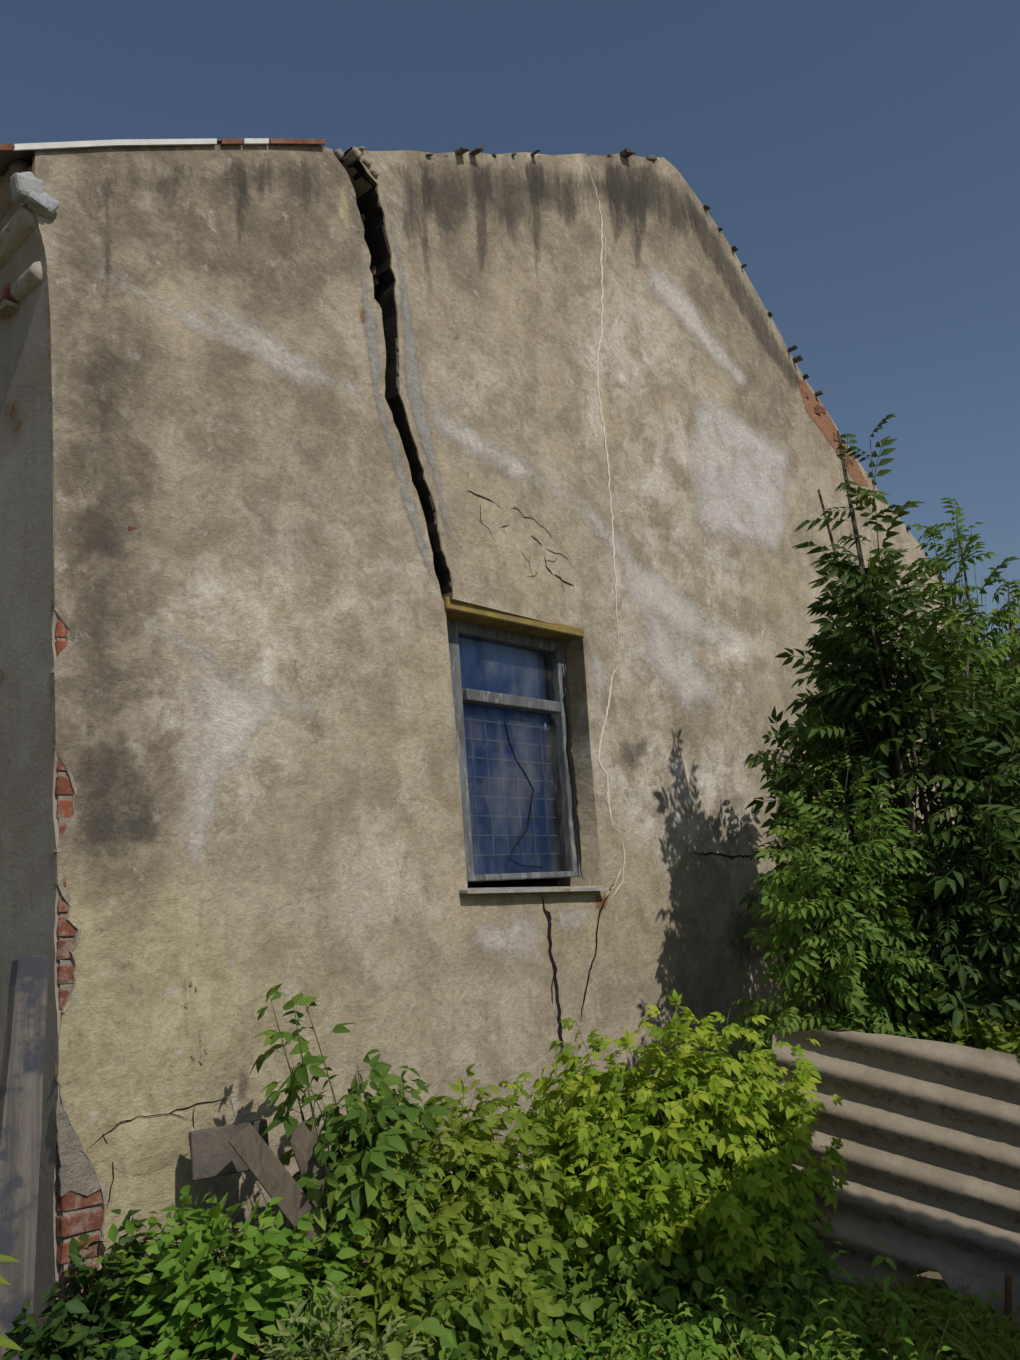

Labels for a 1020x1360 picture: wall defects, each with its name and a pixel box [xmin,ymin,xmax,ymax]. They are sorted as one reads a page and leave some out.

crack [334,146,574,600]
leakage [409,163,797,385]
crack [542,165,625,1061]
spalling [53,875,81,1013]
crack [87,1121,129,1207]
crack [166,1100,219,1129]